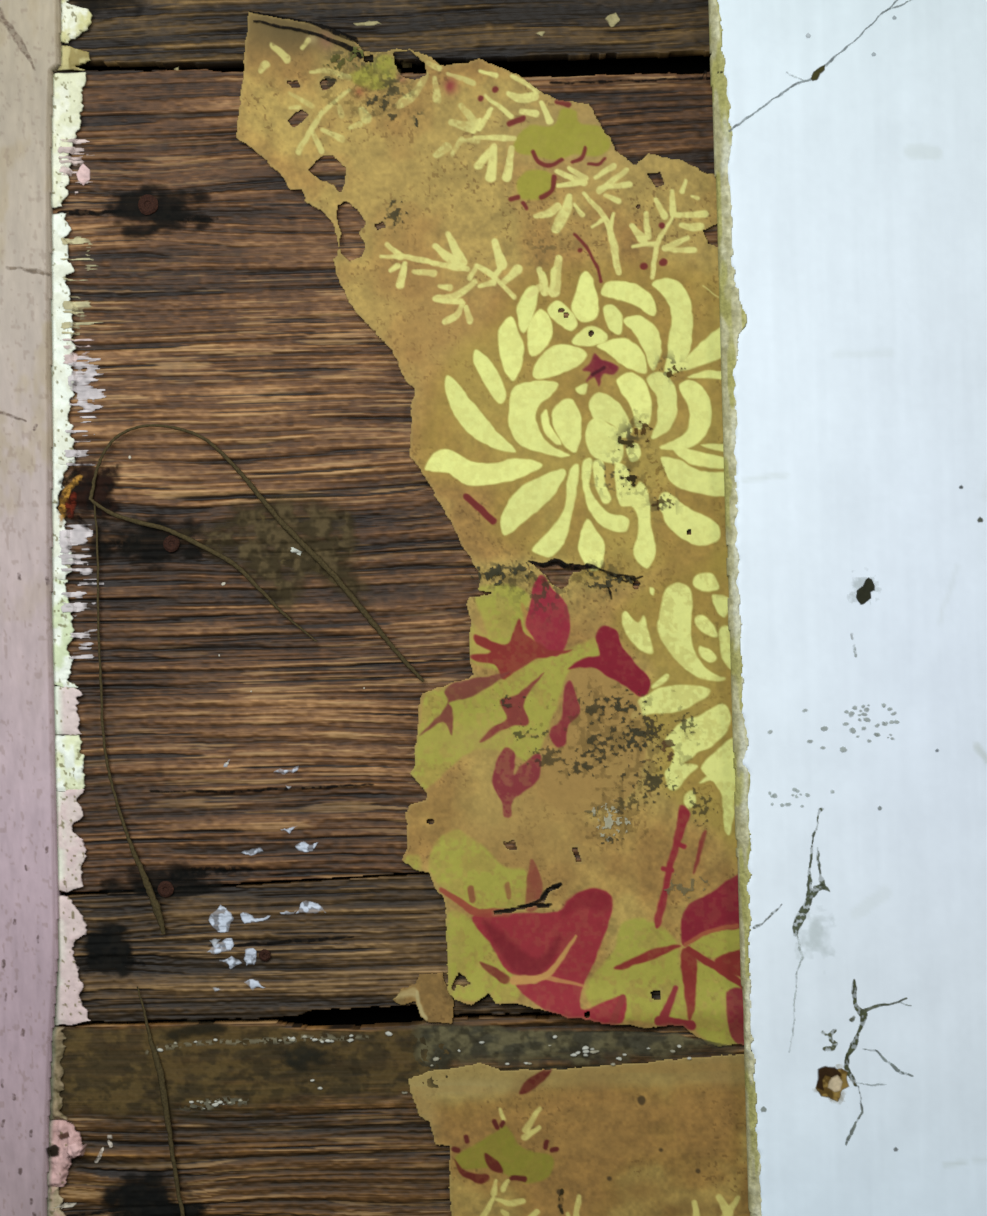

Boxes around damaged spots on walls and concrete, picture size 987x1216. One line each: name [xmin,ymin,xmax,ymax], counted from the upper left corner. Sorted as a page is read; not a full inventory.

crack [729,0,908,132]
rust [107,185,212,237]
peeling [30,0,92,1216]
peeling [856,578,875,604]
crack [753,808,830,973]
crack [822,979,913,1145]